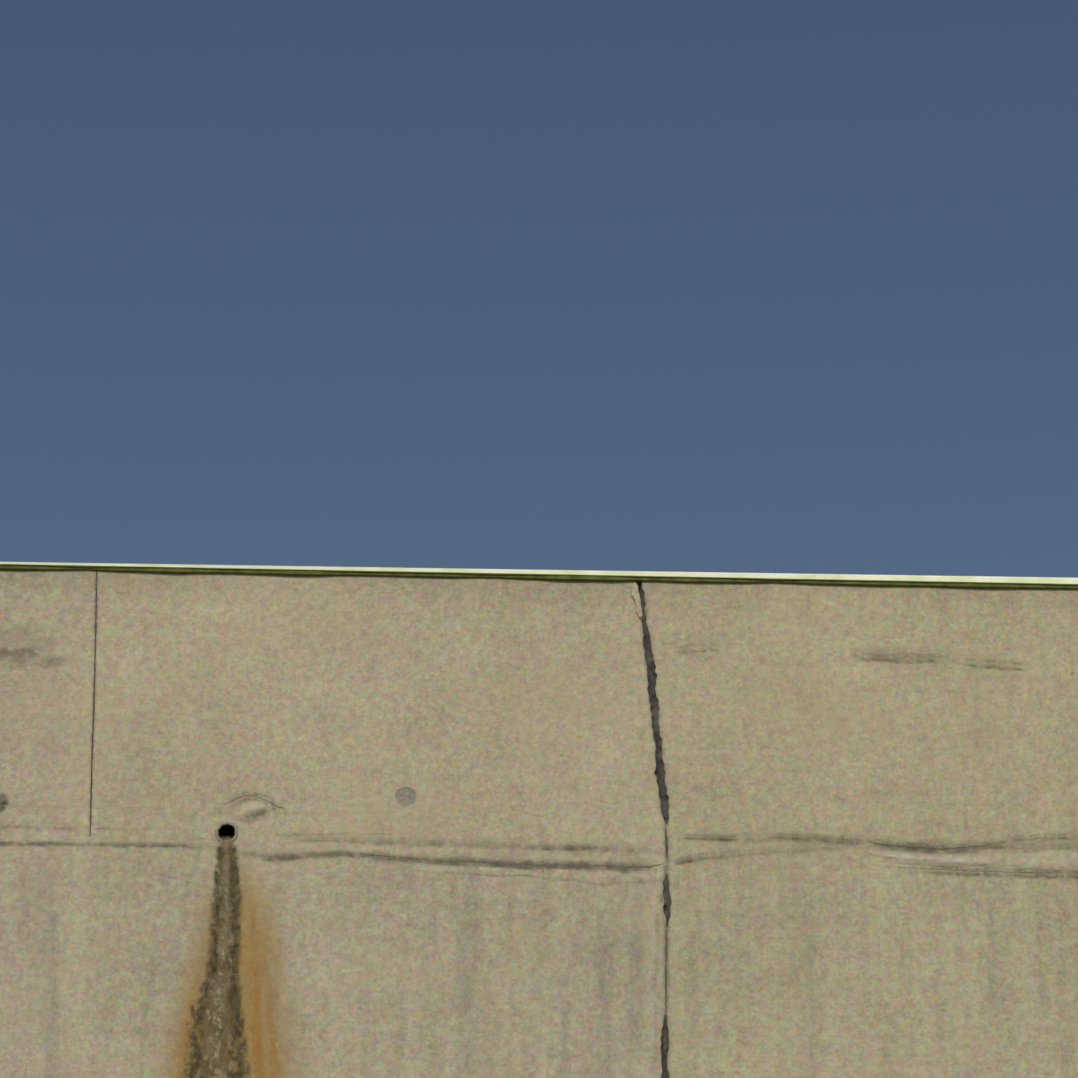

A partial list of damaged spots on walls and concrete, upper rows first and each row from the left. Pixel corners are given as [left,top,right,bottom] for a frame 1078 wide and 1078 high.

water stain [188,838,249,1078]
crack [255,581,732,1078]
crack [765,833,1078,874]